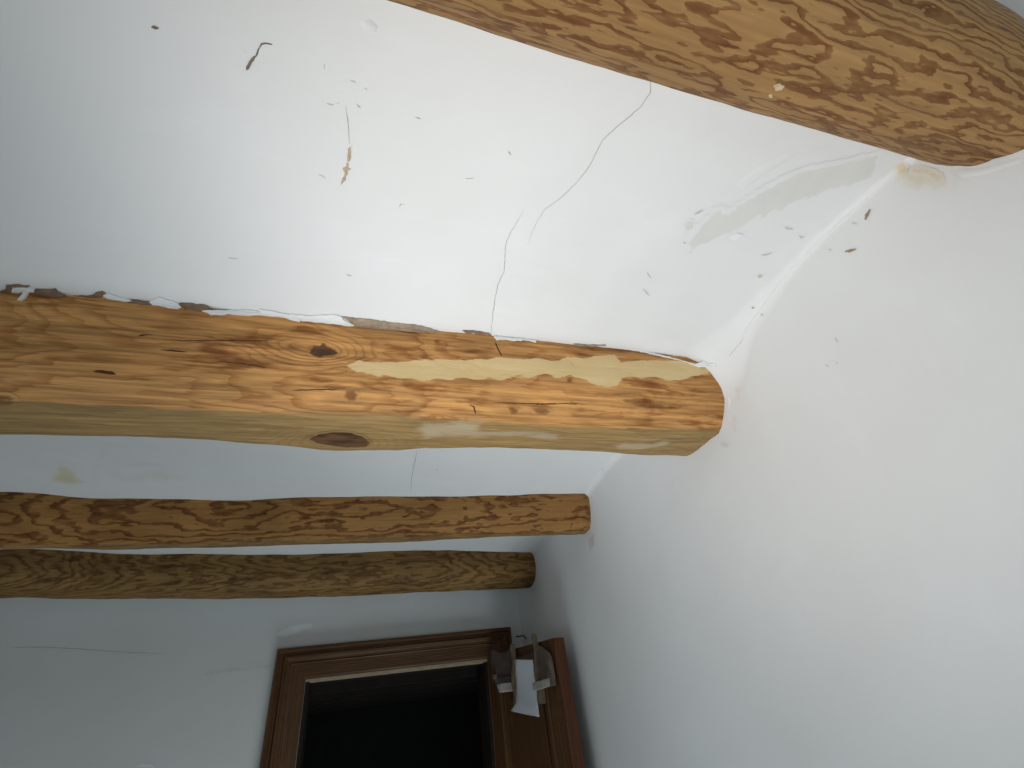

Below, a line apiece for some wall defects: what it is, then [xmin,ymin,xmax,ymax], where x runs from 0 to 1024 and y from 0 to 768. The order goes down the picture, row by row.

peeling [341,112,353,185]
crack [491,82,651,330]
peeling [680,149,887,254]
peeling [0,284,438,333]
peeling [462,330,537,343]
peeling [640,351,716,368]